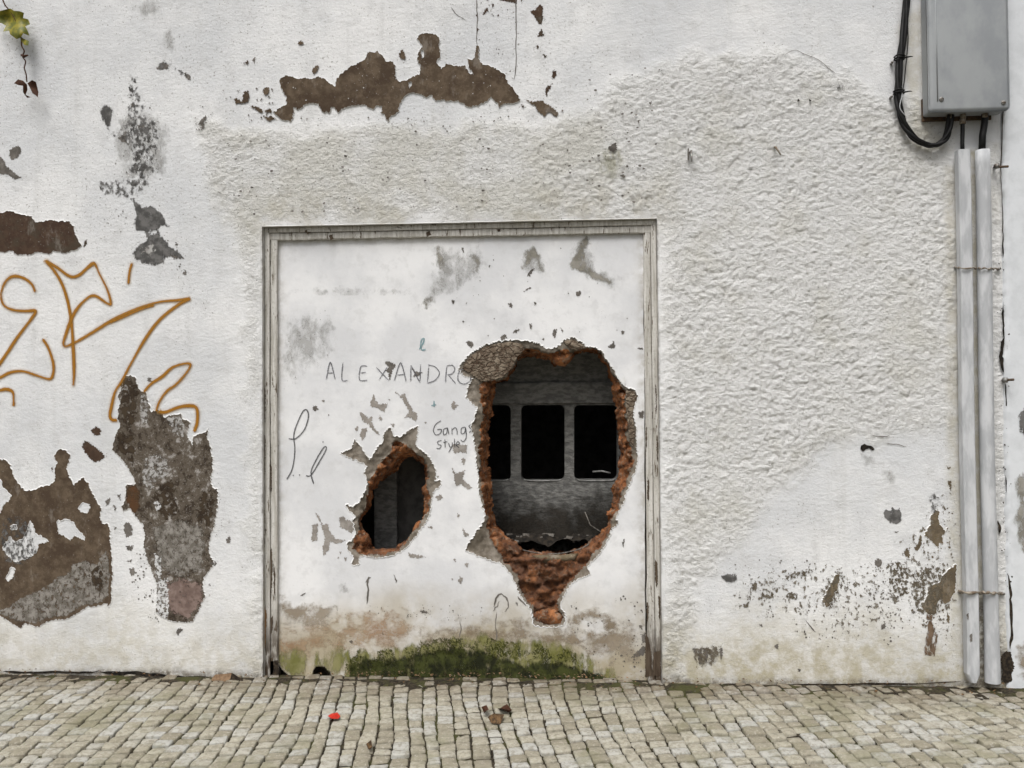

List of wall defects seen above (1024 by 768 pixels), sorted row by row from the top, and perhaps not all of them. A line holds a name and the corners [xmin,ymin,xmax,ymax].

peeling [223,32,563,132]
peeling [476,0,547,58]
peeling [0,210,87,256]
peeling [0,374,231,635]
spalling [311,318,646,672]
peeling [733,467,958,656]